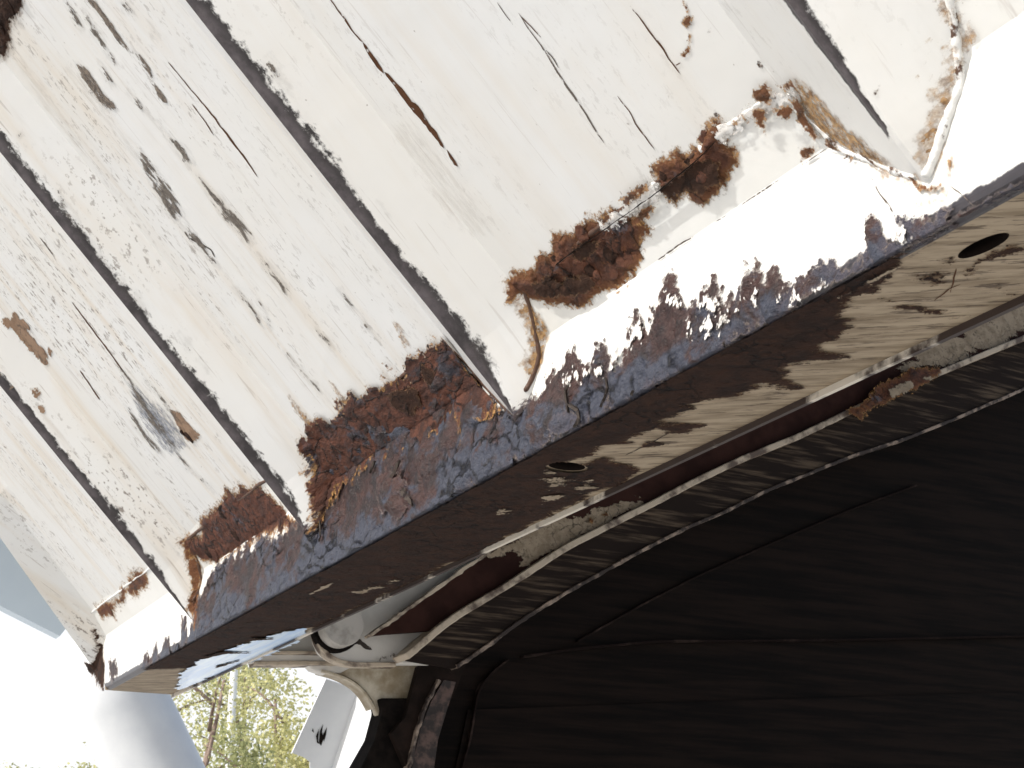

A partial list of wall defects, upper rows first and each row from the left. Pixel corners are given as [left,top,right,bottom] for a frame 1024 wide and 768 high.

crack [330,0,458,167]
corrosion [649,113,740,208]
corrosion [780,47,961,192]
peeling [1,312,53,365]
corrosion [140,181,1024,671]
peeling [487,496,645,567]
corrosion [84,567,149,691]